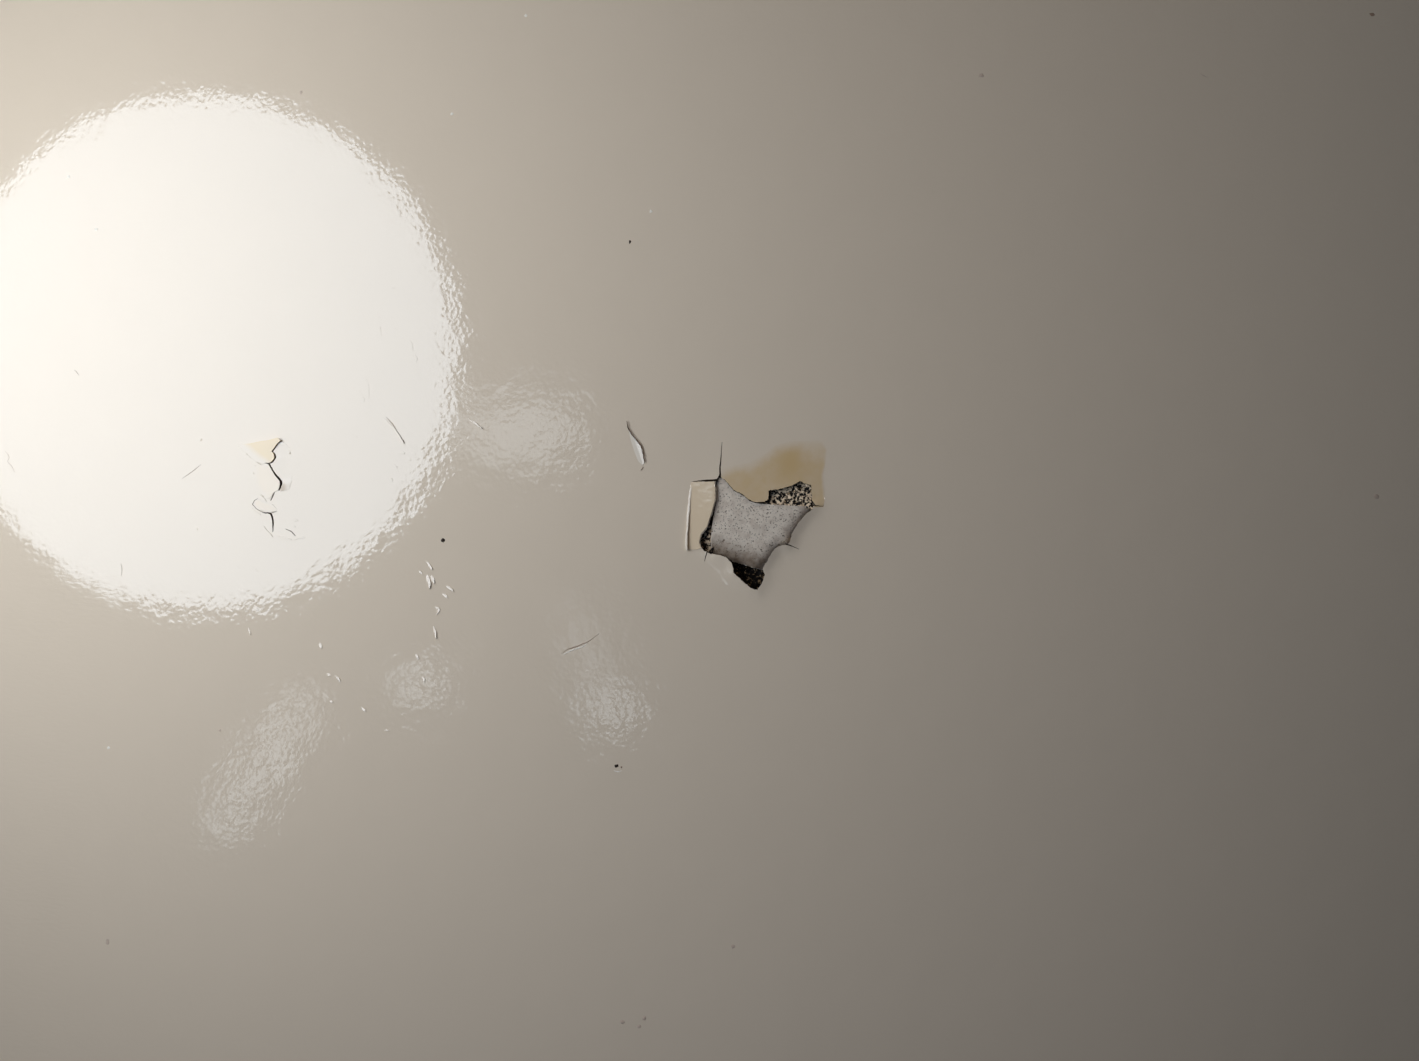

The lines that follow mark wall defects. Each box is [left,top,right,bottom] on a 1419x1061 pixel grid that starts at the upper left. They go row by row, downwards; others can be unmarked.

crack [235,438,305,540]
spalling [650,425,861,637]
water stain [721,440,827,507]